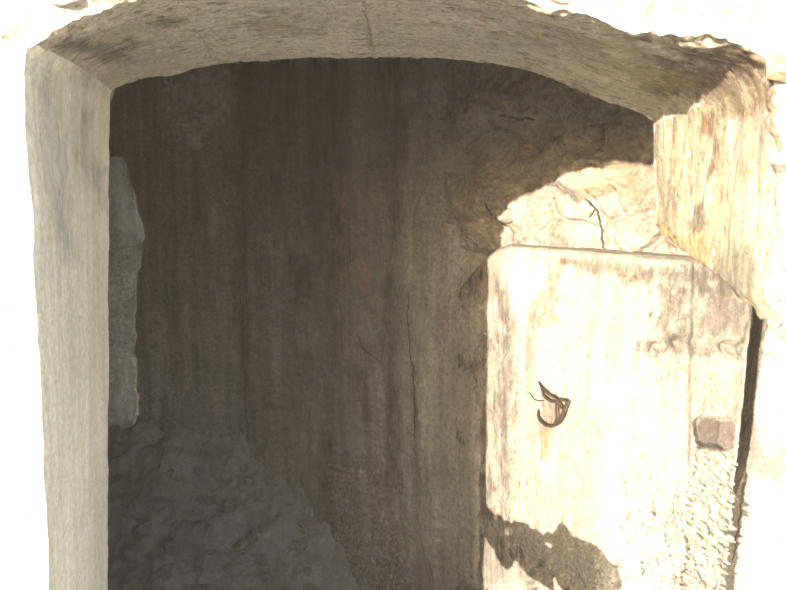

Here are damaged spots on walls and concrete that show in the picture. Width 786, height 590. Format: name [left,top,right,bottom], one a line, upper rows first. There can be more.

crack [362,1,377,56]
crack [407,292,416,438]
rust [540,395,562,458]